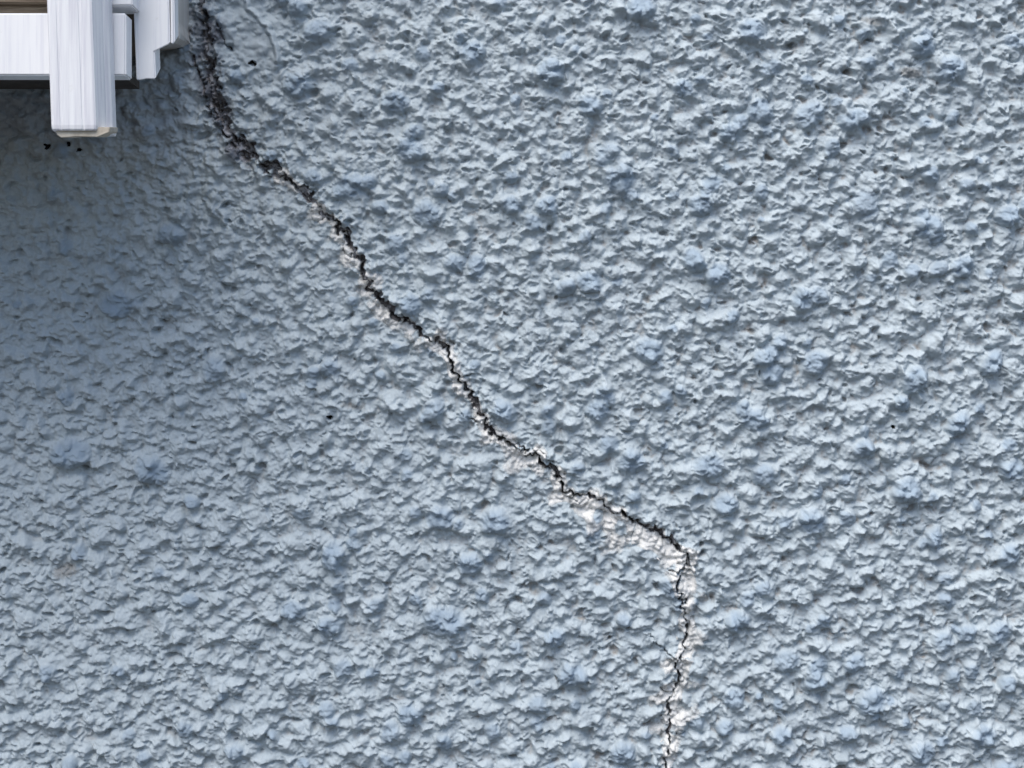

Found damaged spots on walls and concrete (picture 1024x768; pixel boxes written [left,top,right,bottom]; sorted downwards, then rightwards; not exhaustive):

crack [192,0,690,766]